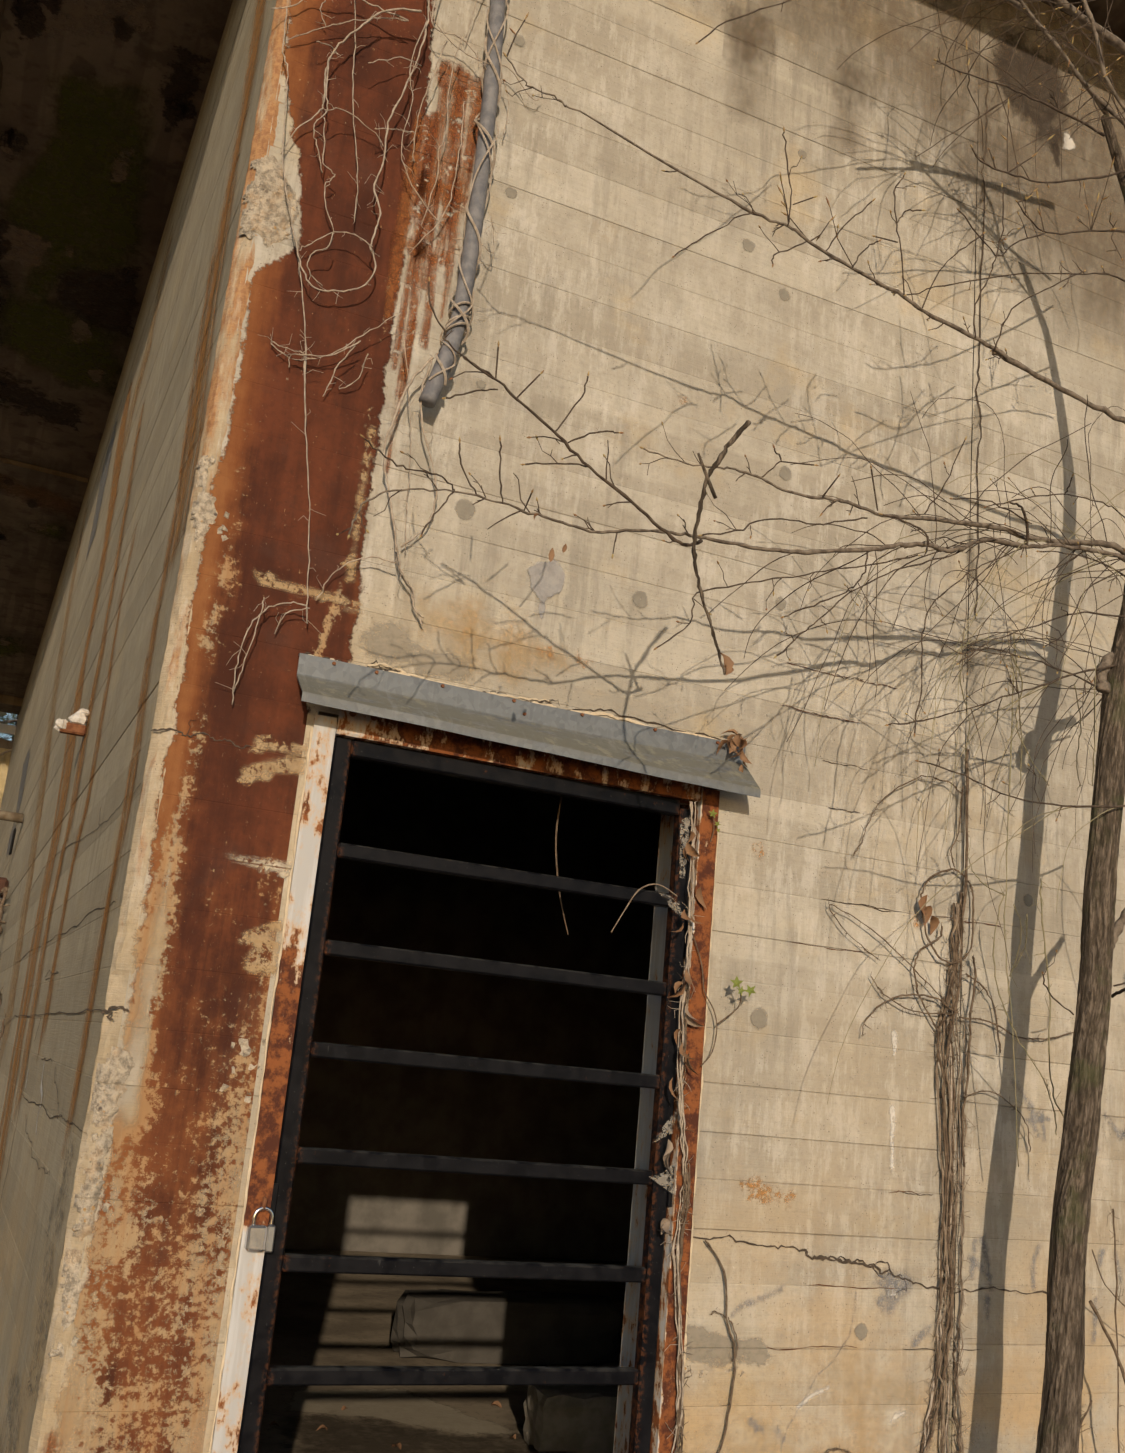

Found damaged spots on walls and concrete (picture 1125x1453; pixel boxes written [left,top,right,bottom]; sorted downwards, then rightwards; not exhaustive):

leakage [987,2,1125,309]
leakage [87,421,116,555]
corrosion [0,387,144,1176]
spalling [5,0,308,1453]
crack [151,720,251,749]
corrosion [46,0,484,1453]
crack [658,1230,1047,1298]